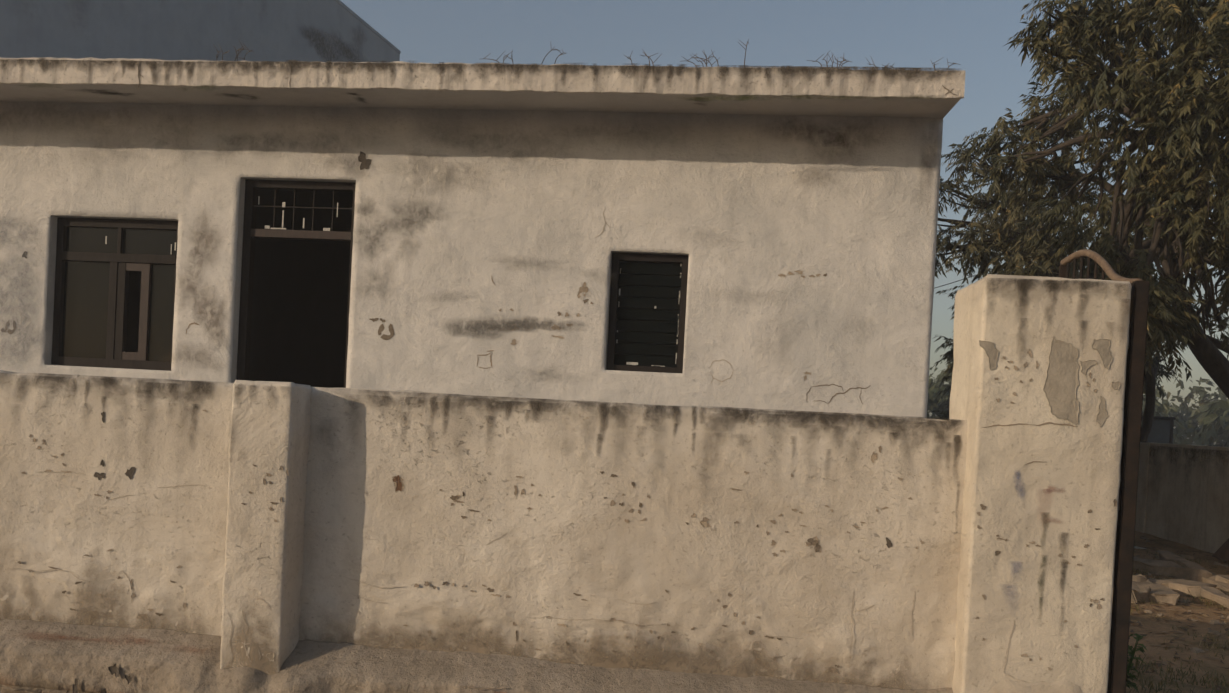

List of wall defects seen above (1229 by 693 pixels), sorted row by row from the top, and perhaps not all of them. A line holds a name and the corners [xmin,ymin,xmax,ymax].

damp [478,63,699,80]
damp [720,65,954,82]
damp [146,379,210,411]
damp [420,393,547,420]
damp [576,400,607,440]
damp [654,406,695,428]
crack [806,384,871,404]
damp [721,407,961,457]
crack [981,421,1078,429]
flaking render [979,337,1120,427]